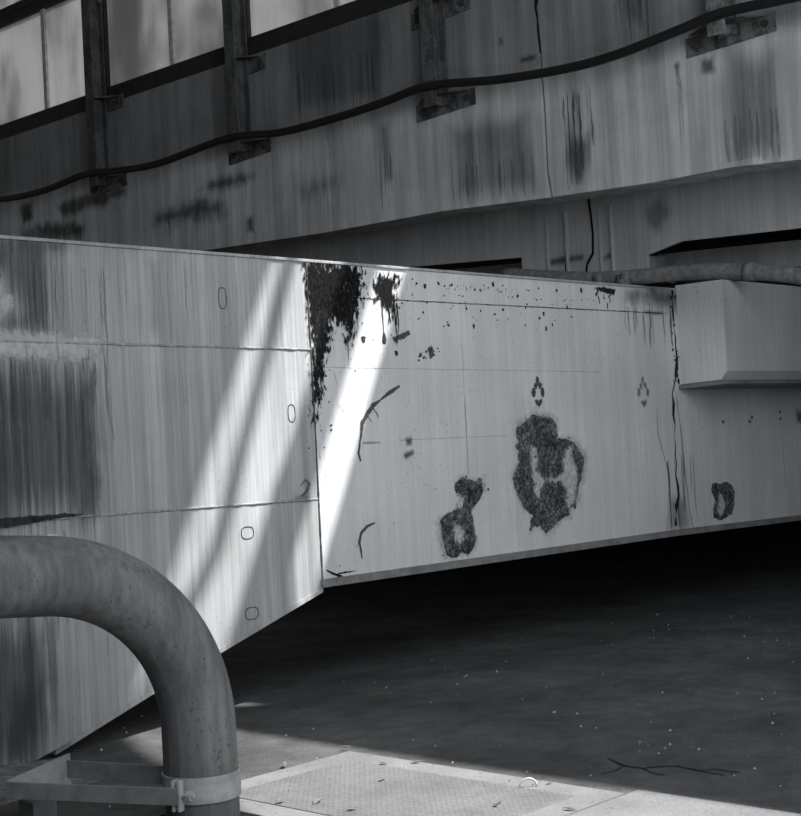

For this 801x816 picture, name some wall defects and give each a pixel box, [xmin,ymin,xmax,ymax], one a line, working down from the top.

crack [530,0,541,65]
damp [0,224,104,514]
spalling [512,376,584,534]
spalling [440,475,489,558]
spalling [711,482,735,520]
crack [602,758,739,776]